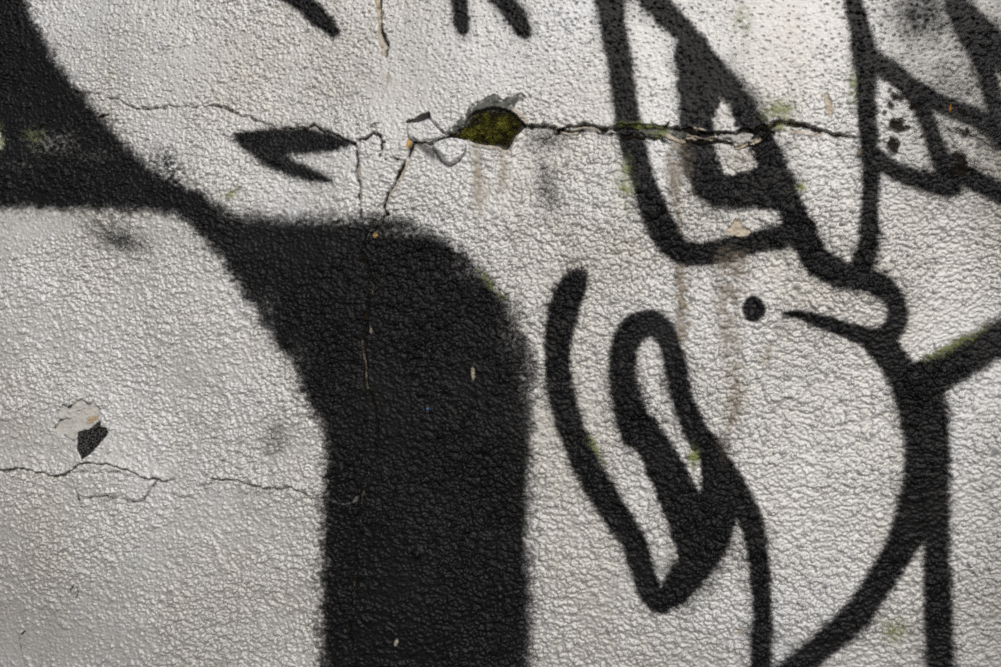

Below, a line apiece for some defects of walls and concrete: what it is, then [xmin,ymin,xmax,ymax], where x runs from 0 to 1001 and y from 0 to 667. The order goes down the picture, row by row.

crack [375,0,389,57]
spalling [406,93,528,152]
crack [525,120,887,149]
crack [920,128,1001,150]
crack [98,93,431,662]
spalling [54,399,108,459]